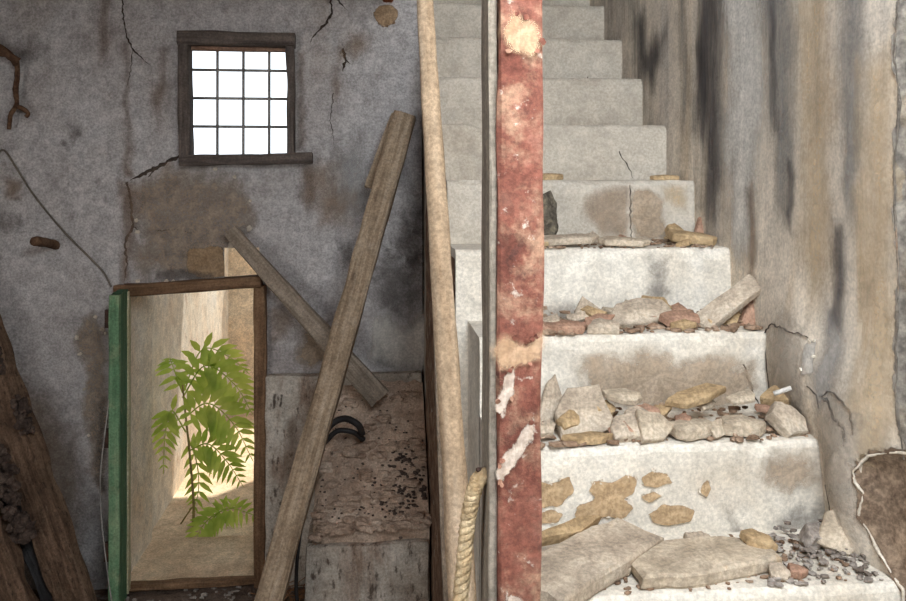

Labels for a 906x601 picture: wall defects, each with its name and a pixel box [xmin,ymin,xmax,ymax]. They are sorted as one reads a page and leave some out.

crack [121,0,151,87]
crack [311,0,347,41]
crack [342,48,350,71]
water stain [639,20,660,83]
water stain [698,0,793,264]
crack [124,155,179,280]
water stain [371,269,424,369]
water stain [816,227,844,400]
flaking render [851,0,906,601]
peeling [495,334,542,418]
peeling [496,419,534,488]
flaking render [575,468,695,526]